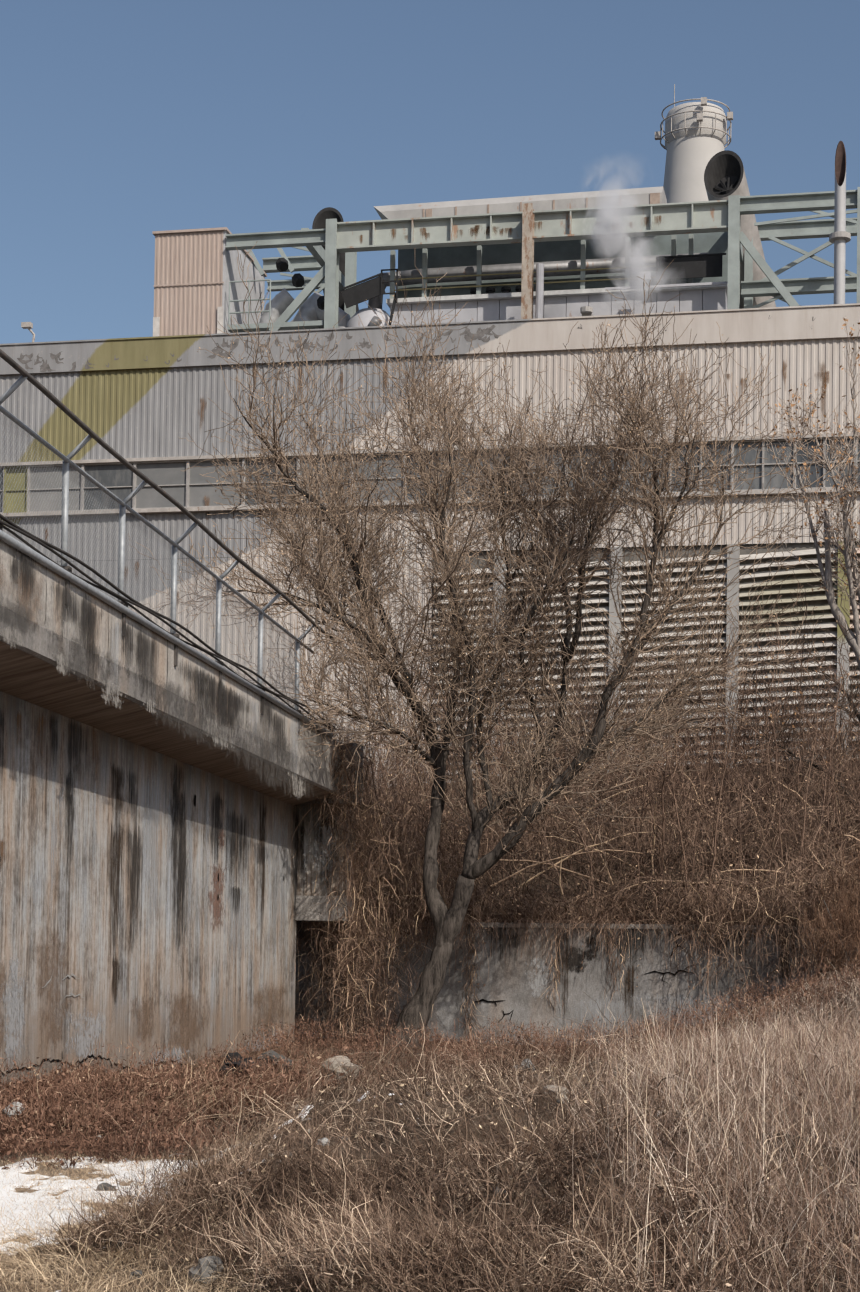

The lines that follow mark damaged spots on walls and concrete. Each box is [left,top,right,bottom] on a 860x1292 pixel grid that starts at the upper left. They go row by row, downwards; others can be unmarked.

water stain [13,548,36,597]
water stain [53,581,159,688]
water stain [182,660,298,758]
water stain [33,717,88,907]
water stain [93,764,338,1011]
crack [475,999,513,1020]
water stain [556,929,758,1035]
crack [643,931,693,984]
crack [0,1051,195,1083]